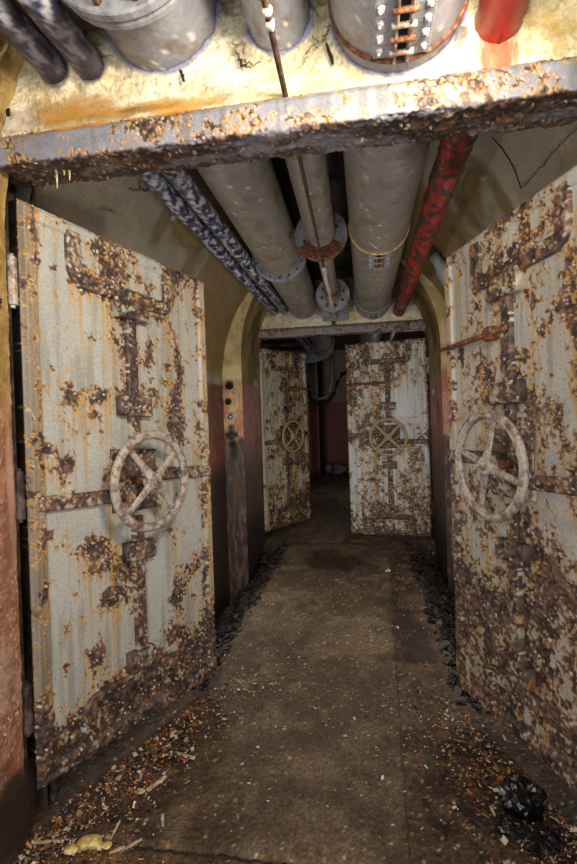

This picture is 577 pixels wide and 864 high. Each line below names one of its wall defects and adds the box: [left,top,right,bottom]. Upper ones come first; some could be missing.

corrosion [296,239,346,262]
crack [390,544,410,862]
crack [112,842,287,864]